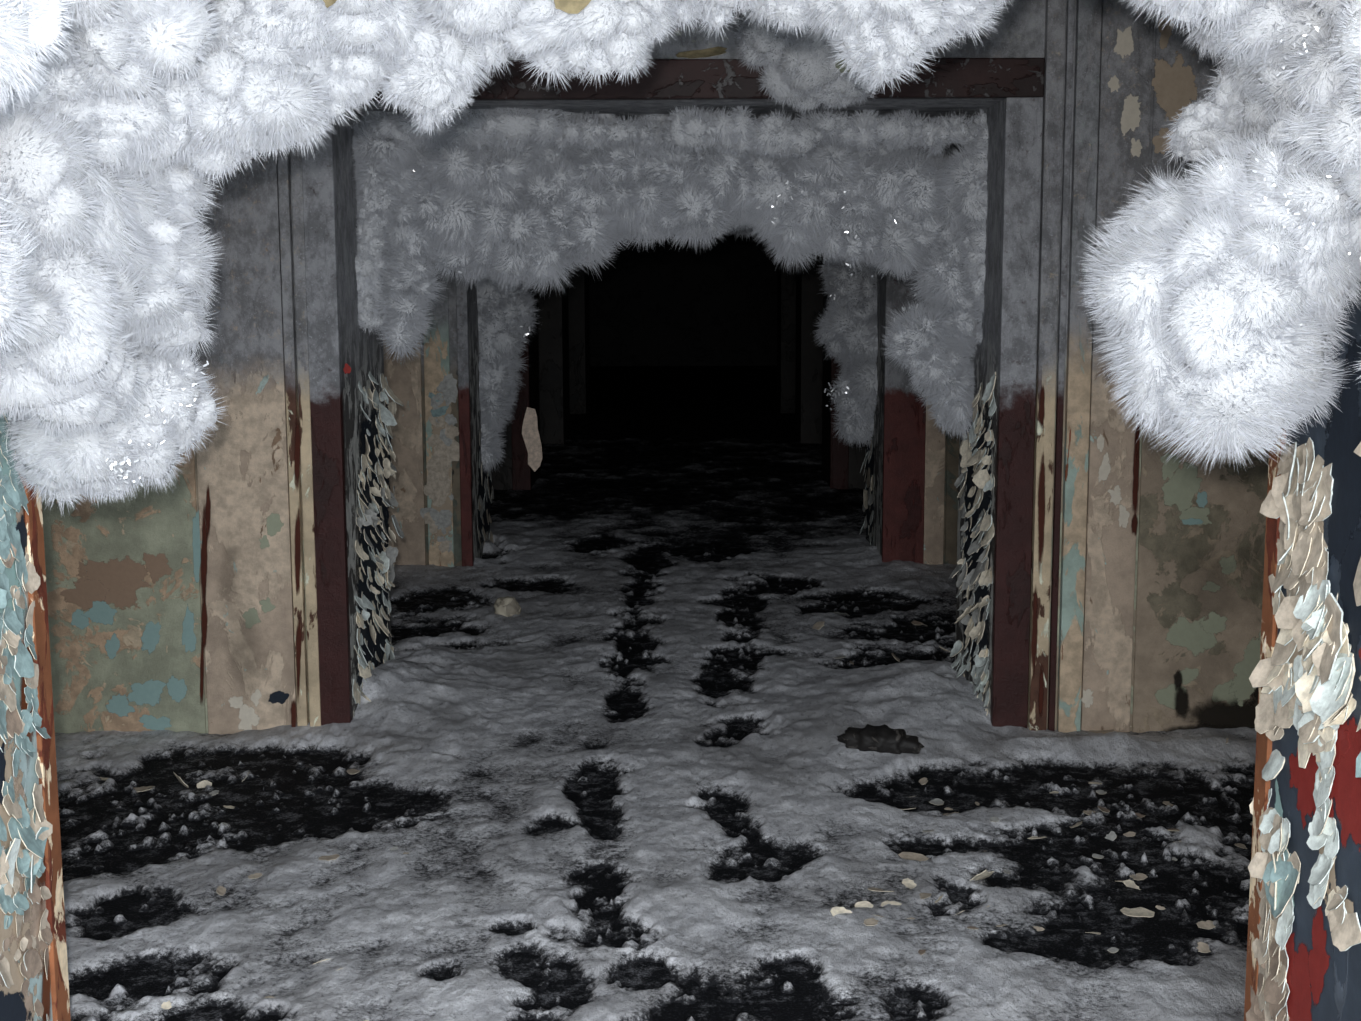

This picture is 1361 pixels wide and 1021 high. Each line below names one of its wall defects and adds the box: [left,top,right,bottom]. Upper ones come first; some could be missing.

spalling [1108,15,1198,157]
peeling [0,412,53,1021]
peeling [60,553,173,659]
peeling [106,676,187,730]
peeling [192,511,201,583]
peeling [343,363,404,716]
peeling [420,373,460,553]
peeling [939,372,997,716]
peeling [1160,453,1212,526]
peeling [1154,611,1227,710]
peeling [1212,335,1361,1021]